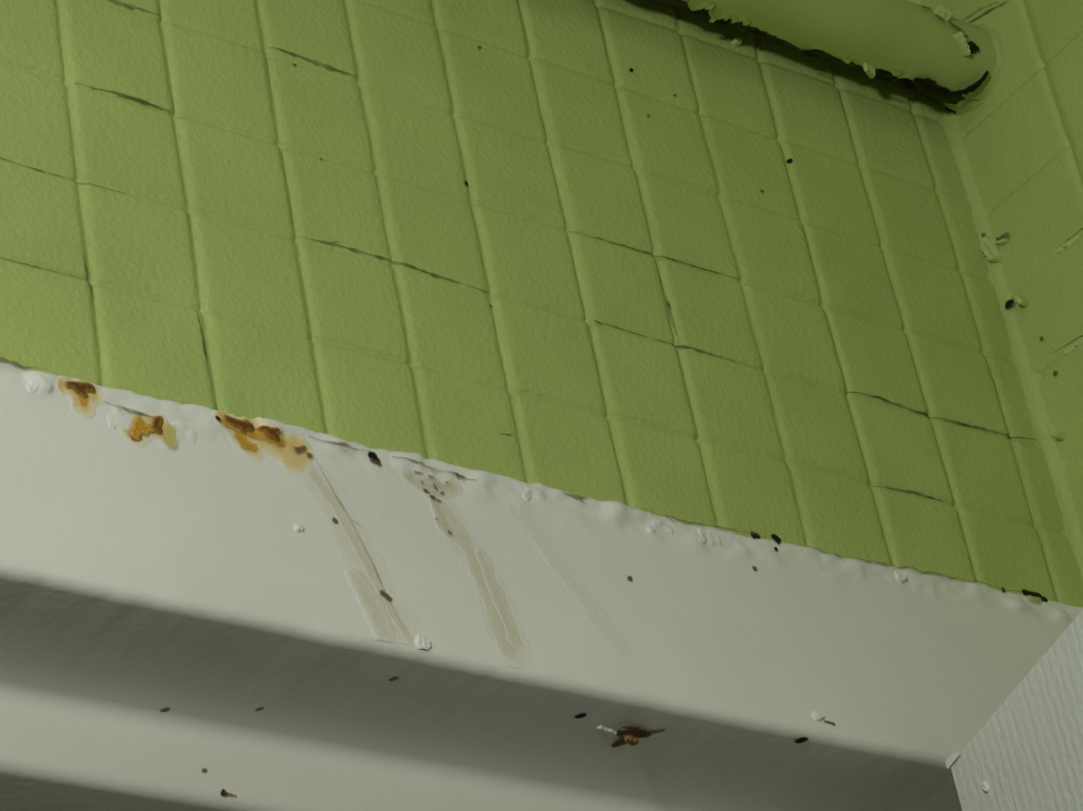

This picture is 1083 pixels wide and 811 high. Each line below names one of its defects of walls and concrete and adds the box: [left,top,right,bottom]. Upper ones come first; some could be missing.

peeling [921,4,979,57]
peeling [844,57,989,113]
corrosion [55,375,107,420]
corrosion [119,409,181,450]
corrosion [212,410,314,475]